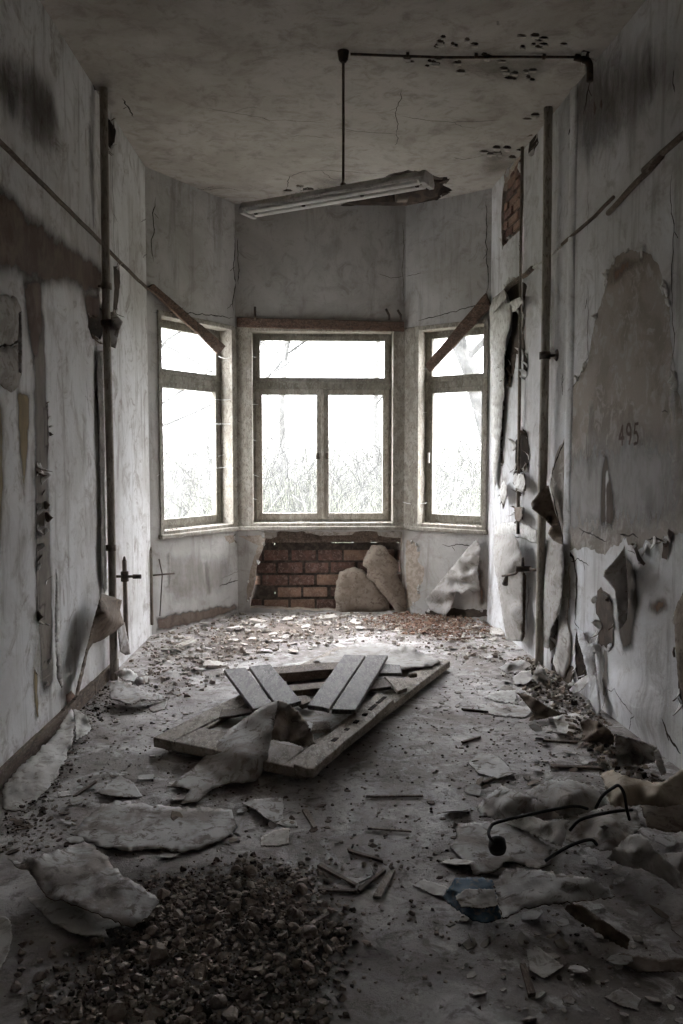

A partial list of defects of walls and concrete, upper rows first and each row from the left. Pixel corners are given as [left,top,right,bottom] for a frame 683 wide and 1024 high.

damp [0,68,56,140]
flaking render [480,134,539,249]
peeling [549,246,683,566]
flaking render [224,531,424,625]
peeling [549,587,614,692]